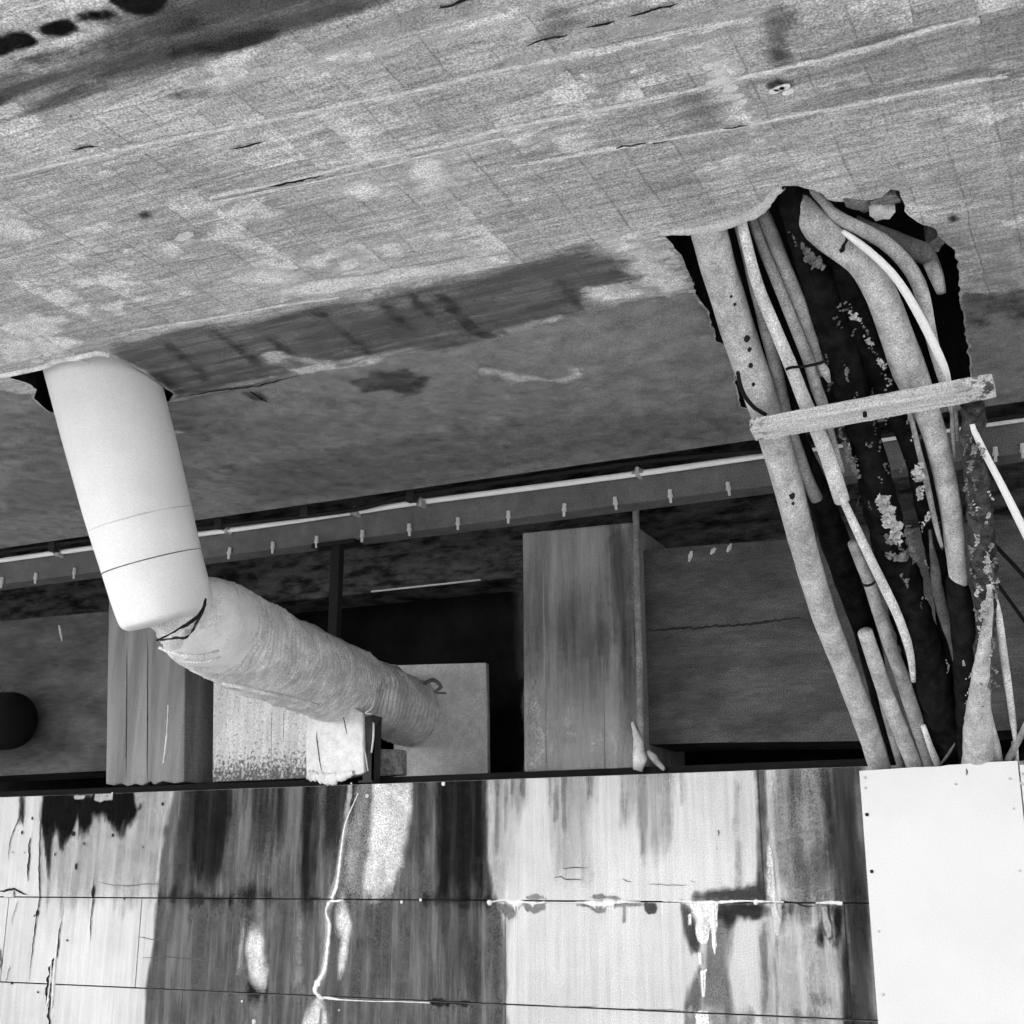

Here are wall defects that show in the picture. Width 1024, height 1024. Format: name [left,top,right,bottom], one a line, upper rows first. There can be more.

damp [171,29,278,57]
spalling [829,190,901,221]
spalling [924,225,944,252]
peeling [663,252,696,293]
damp [115,232,688,394]
crack [646,617,800,631]
damp [41,793,141,873]
damp [145,767,878,1024]